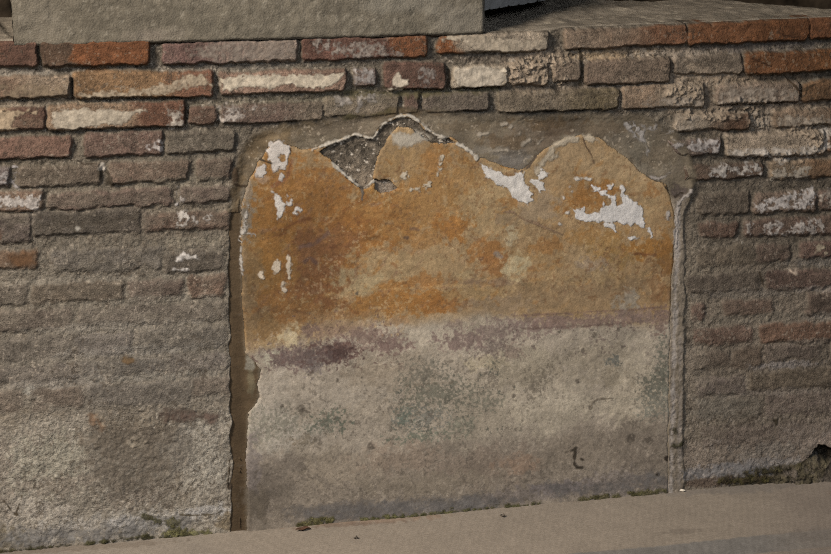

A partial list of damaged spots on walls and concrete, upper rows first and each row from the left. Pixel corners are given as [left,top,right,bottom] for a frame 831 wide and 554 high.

efflorescence [0,165,42,210]
peeling [239,204,256,275]
peeling [255,140,290,181]
peeling [271,191,302,220]
flaking render [320,117,455,193]
peeling [482,134,595,204]
efflorescence [673,138,721,155]
efflorescence [709,161,831,214]
efflorescence [764,218,825,236]
peeling [258,255,291,293]